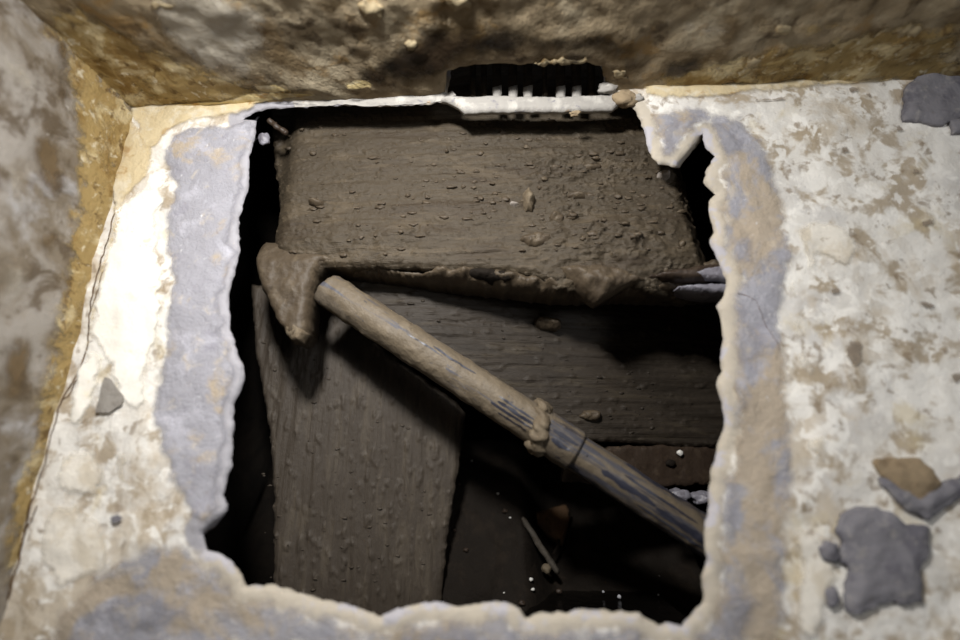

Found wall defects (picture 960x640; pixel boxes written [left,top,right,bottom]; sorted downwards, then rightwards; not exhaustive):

spalling [292,91,456,107]
flaking render [900,73,960,135]
peeling [802,222,856,265]
spalling [70,109,280,586]
spalling [381,346,556,465]
spalling [654,109,792,640]
peeling [58,450,102,492]
spalling [42,506,577,640]
flaking render [797,457,960,635]
spalling [590,629,640,640]